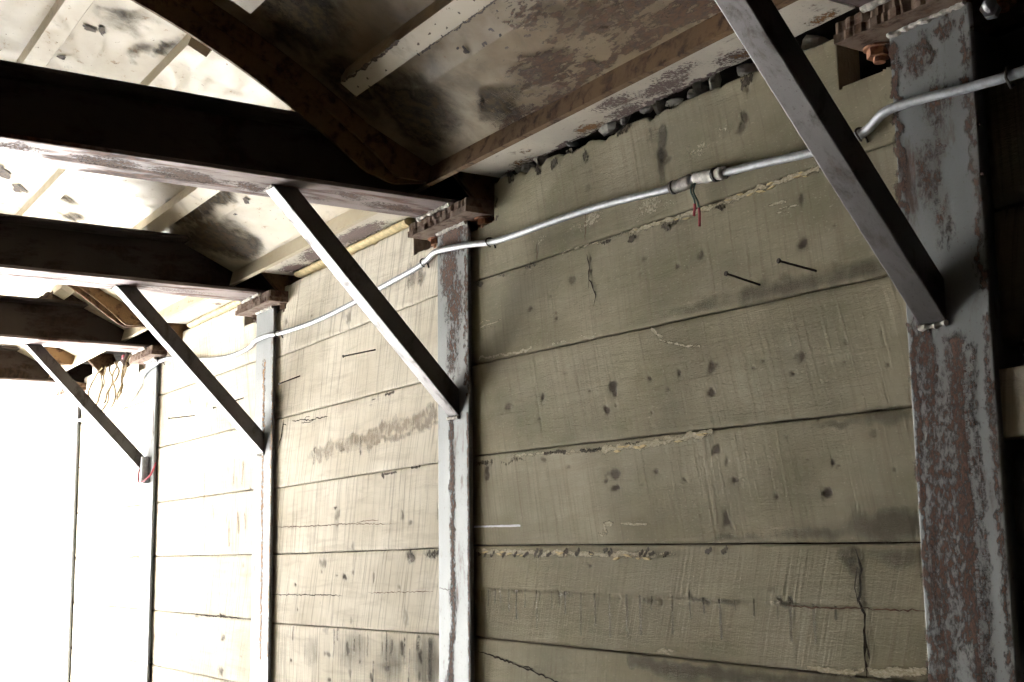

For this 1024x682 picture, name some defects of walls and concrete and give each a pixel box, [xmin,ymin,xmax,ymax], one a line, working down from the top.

peeling [0,165,28,193]
leakage [175,191,262,259]
rust [437,226,470,396]
crack [585,214,596,307]
rust [885,10,989,290]
rust [447,412,471,682]
crack [786,549,920,677]
rust [906,312,1015,682]